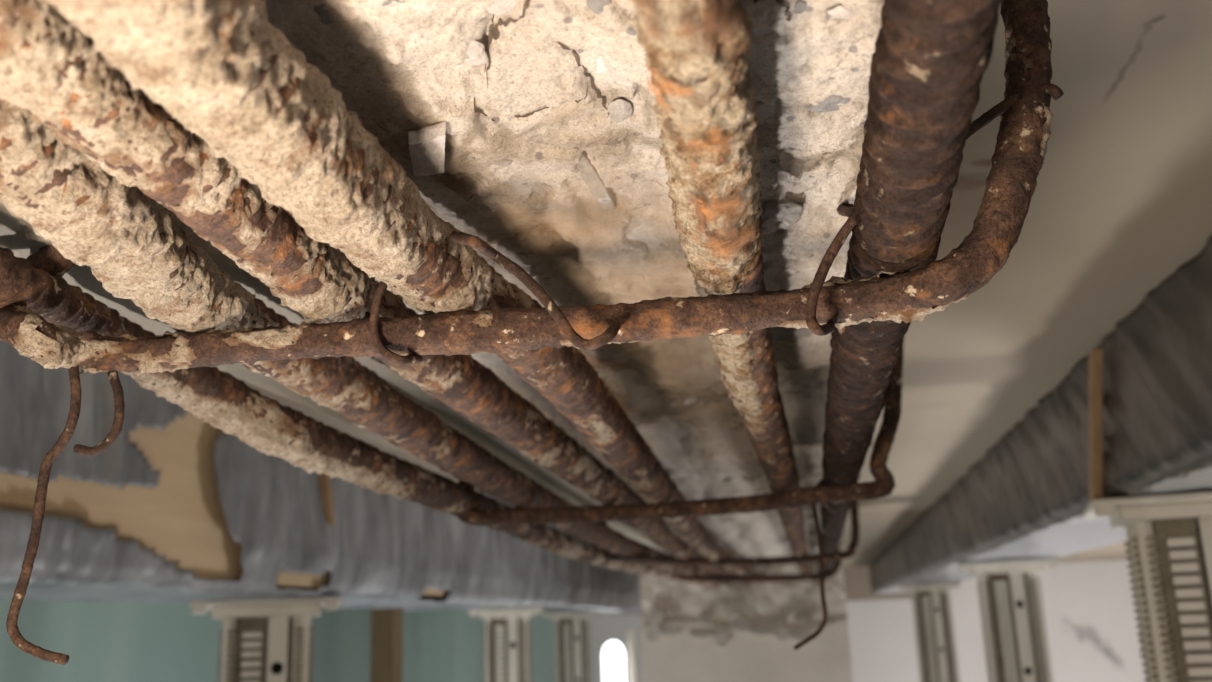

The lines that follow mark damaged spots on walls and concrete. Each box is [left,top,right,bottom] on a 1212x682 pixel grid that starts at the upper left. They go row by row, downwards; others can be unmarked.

corrosion [679,0,748,51]
corrosion [647,70,692,111]
corrosion [434,173,467,194]
spalling [0,0,1003,337]
corrosion [688,196,754,259]
spalling [121,320,911,587]
flaking render [645,608,812,648]